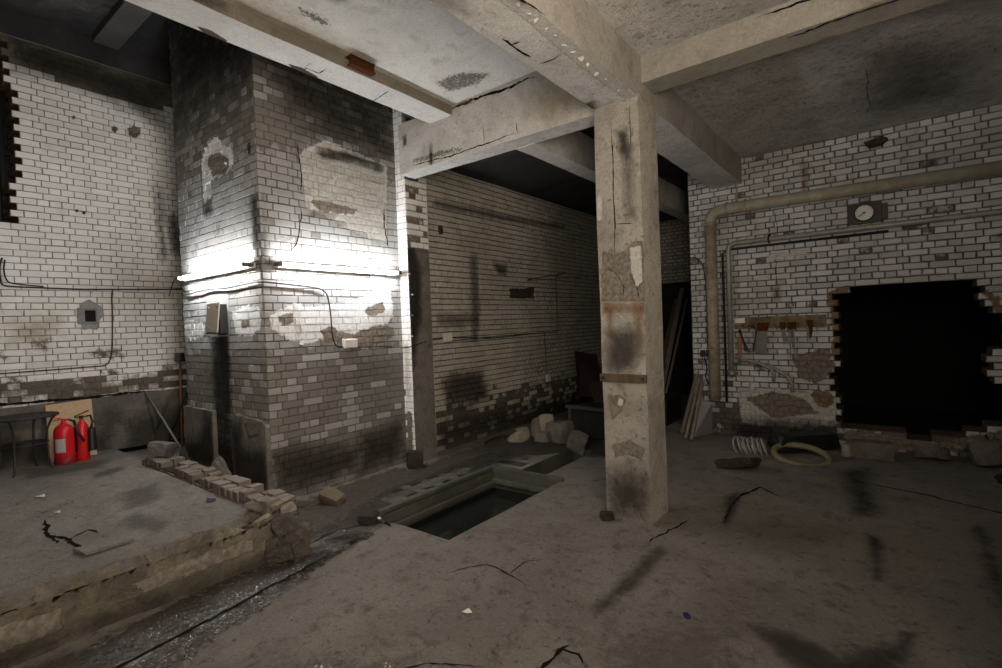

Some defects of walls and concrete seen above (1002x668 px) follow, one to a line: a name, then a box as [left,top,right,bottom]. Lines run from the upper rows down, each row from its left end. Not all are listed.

crack [759,0,810,17]
crack [451,39,560,109]
crack [414,124,519,166]
peeling [201,136,234,214]
peeling [738,286,1002,452]
spalling [608,394,626,420]
spalling [612,440,644,459]
crack [724,487,780,523]
crack [42,520,99,547]